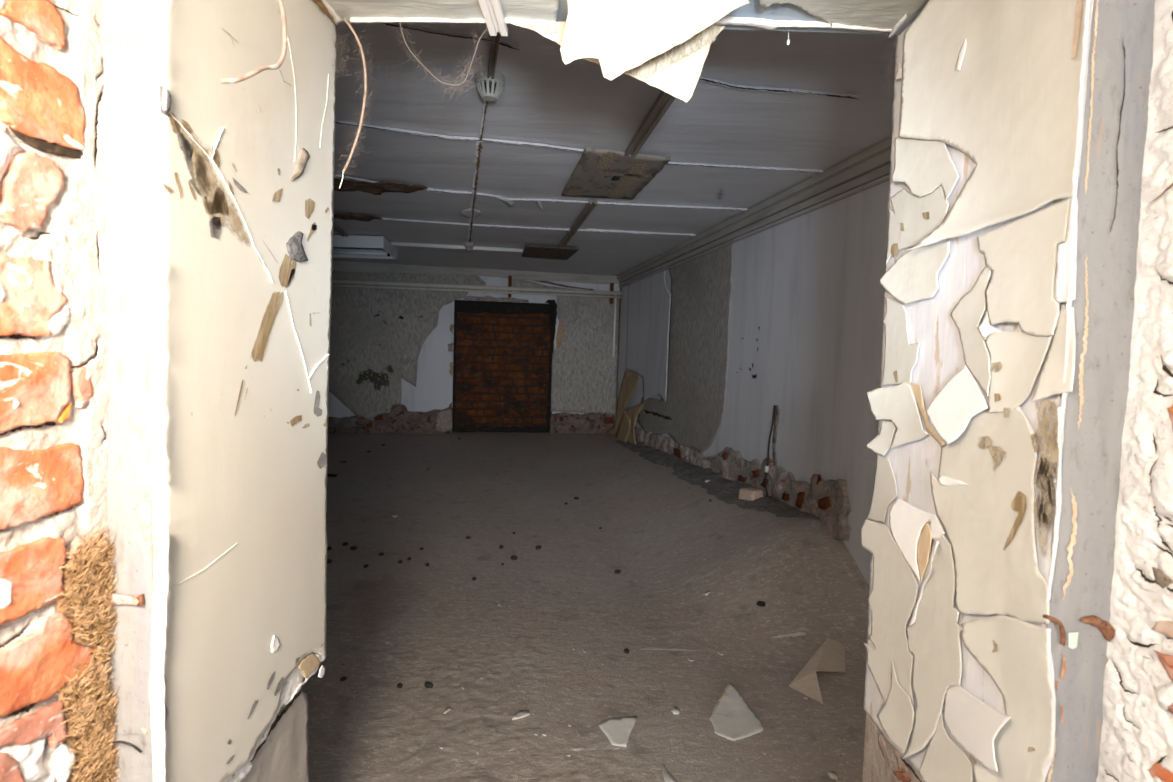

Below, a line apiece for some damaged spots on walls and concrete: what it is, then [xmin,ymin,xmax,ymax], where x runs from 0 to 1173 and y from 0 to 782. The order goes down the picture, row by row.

flaking render [0,0,66,49]
flaking render [0,36,86,231]
damp [168,113,249,243]
flaking render [0,253,68,337]
flaking render [0,351,94,531]
flaking render [328,403,452,434]
peeling [505,0,1099,782]
flaking render [0,534,103,782]
spalling [225,644,325,782]
flaking render [1149,763,1173,782]
flaking render [1152,621,1173,639]
flaking render [1154,650,1173,682]